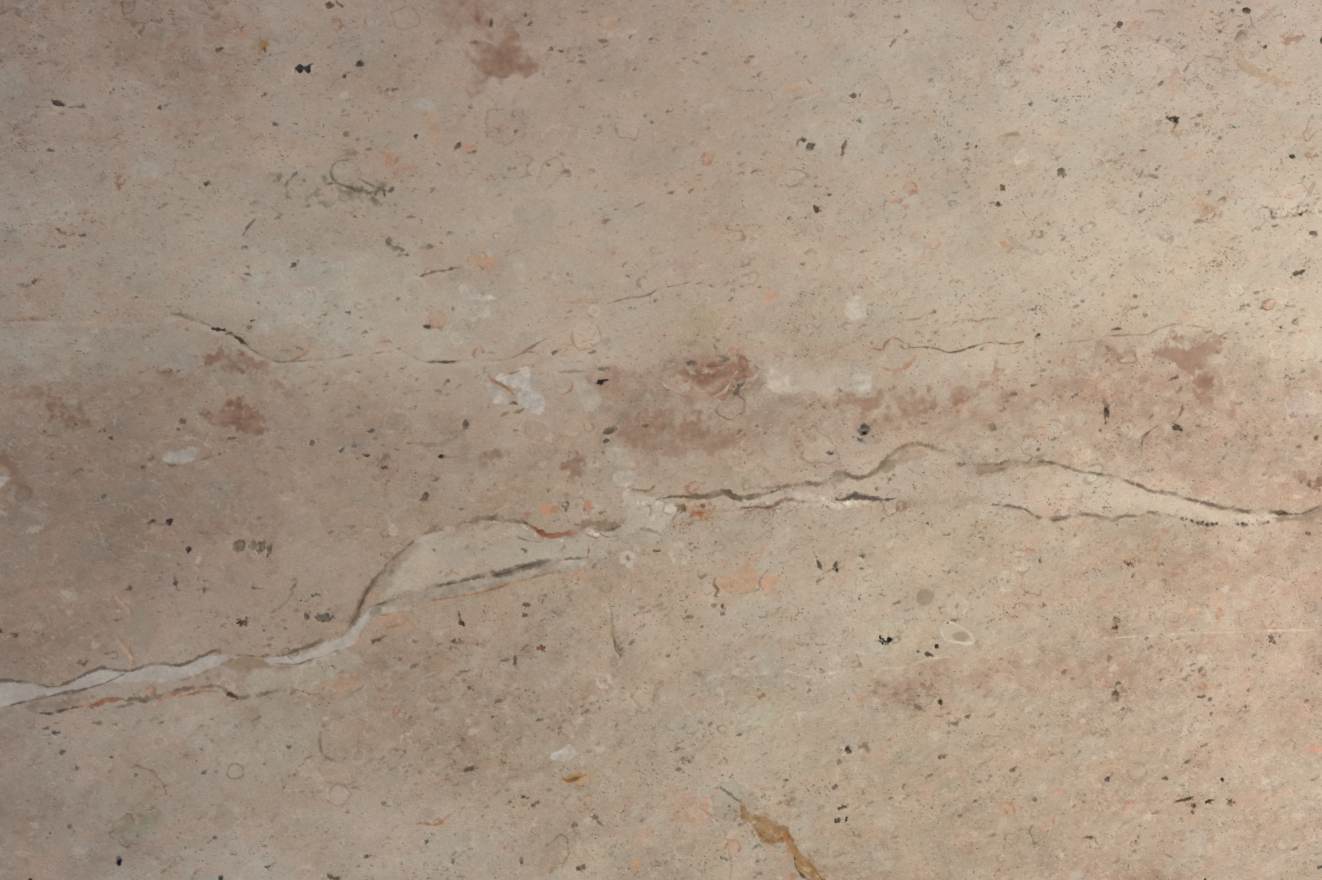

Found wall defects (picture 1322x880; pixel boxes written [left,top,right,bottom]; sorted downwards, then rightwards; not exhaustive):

crack [0,400,1322,719]